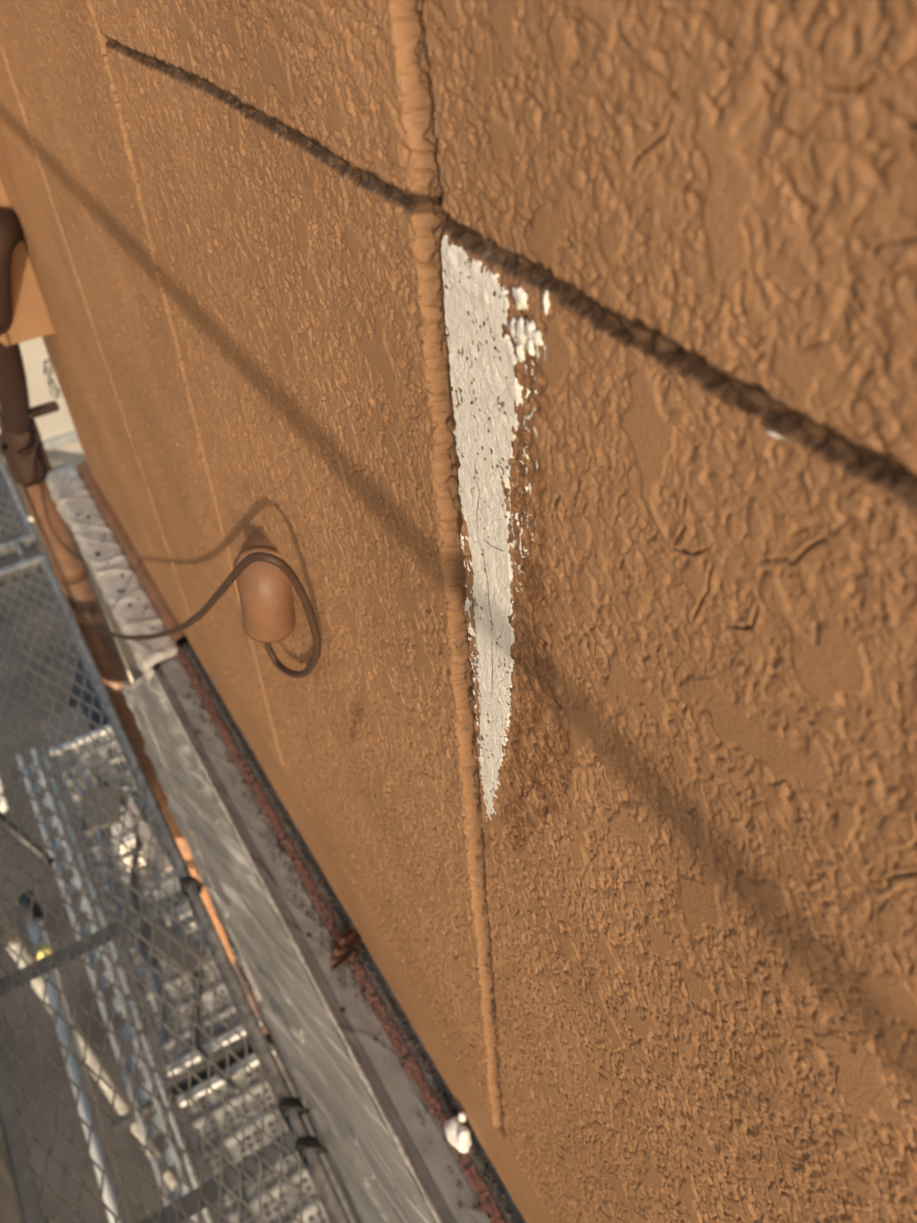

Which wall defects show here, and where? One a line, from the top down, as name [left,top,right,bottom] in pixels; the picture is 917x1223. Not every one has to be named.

crack [475,476,504,693]